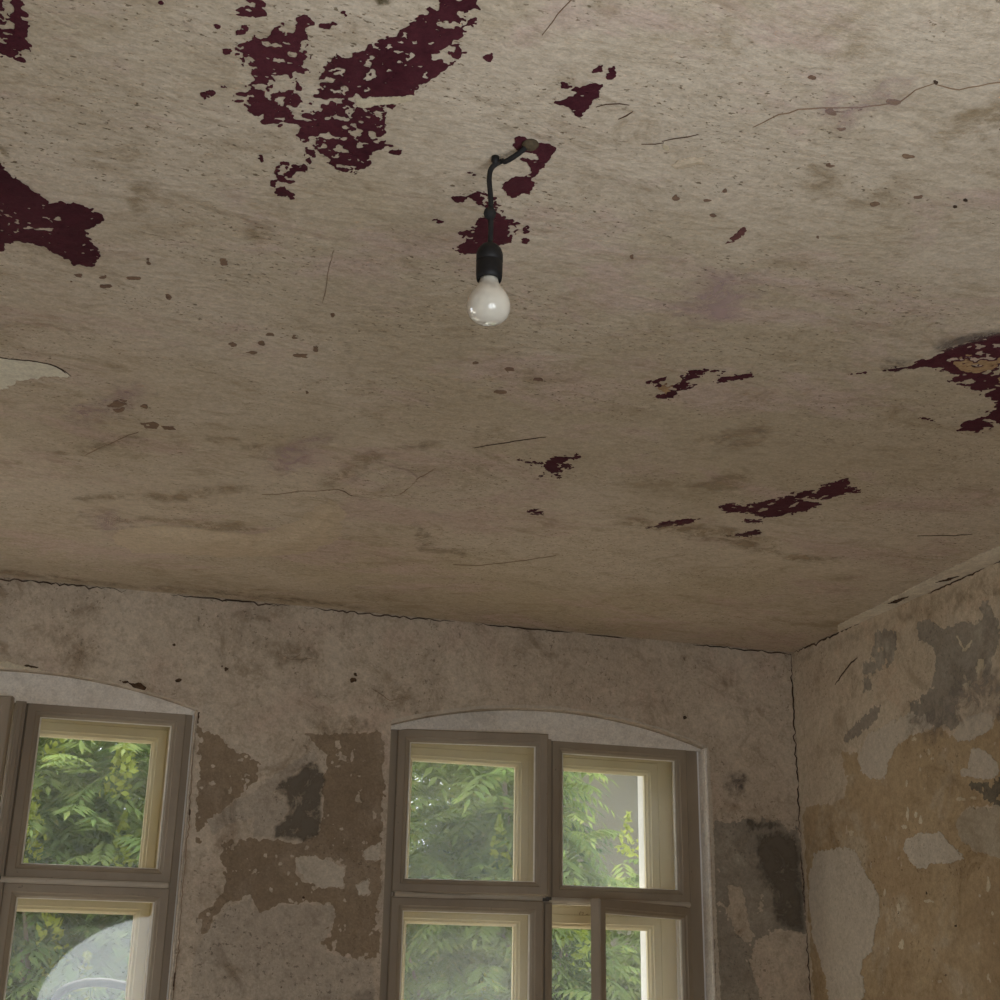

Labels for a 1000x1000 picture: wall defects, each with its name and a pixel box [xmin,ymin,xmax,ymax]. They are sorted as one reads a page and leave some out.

peeling [0,0,32,63]
peeling [200,0,481,200]
peeling [554,65,616,118]
crack [753,82,1000,128]
peeling [0,163,104,282]
peeling [451,136,556,255]
peeling [645,368,754,400]
peeling [883,333,1000,433]
peeling [718,478,861,538]
peeling [198,730,386,960]
water stain [747,820,802,928]
peeling [713,600,1000,1000]